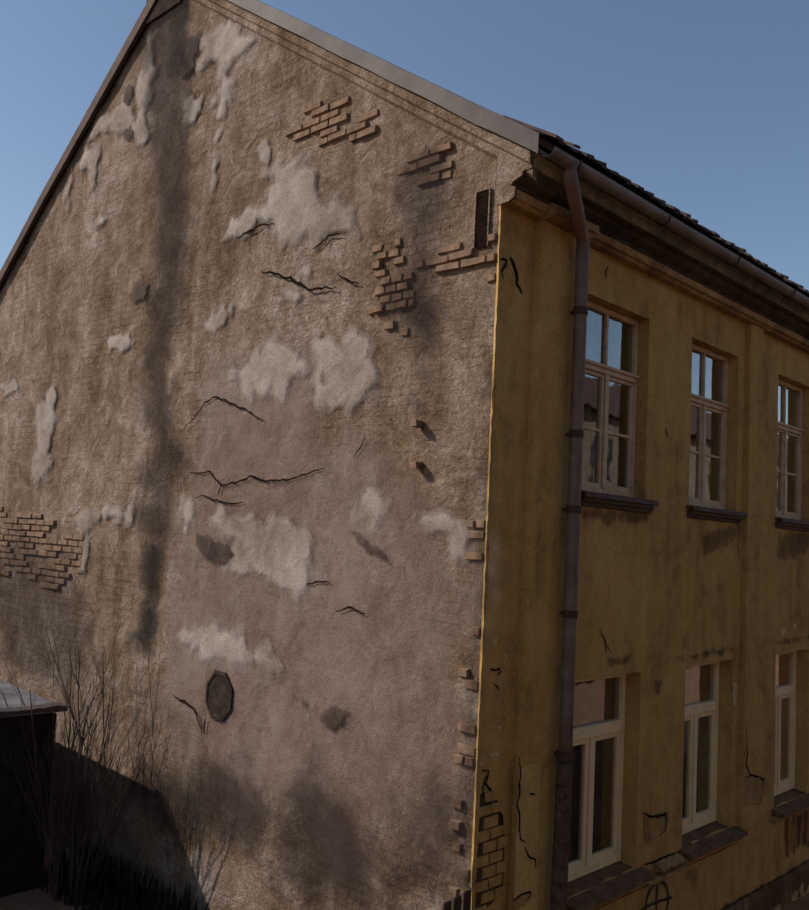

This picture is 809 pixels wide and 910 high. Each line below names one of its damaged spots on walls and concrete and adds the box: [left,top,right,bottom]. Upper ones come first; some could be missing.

leakage [145,1,185,288]
crack [261,271,359,291]
crack [500,257,522,294]
crack [184,396,263,429]
crack [190,467,325,504]
crack [173,695,206,733]
flaking render [448,789,532,910]